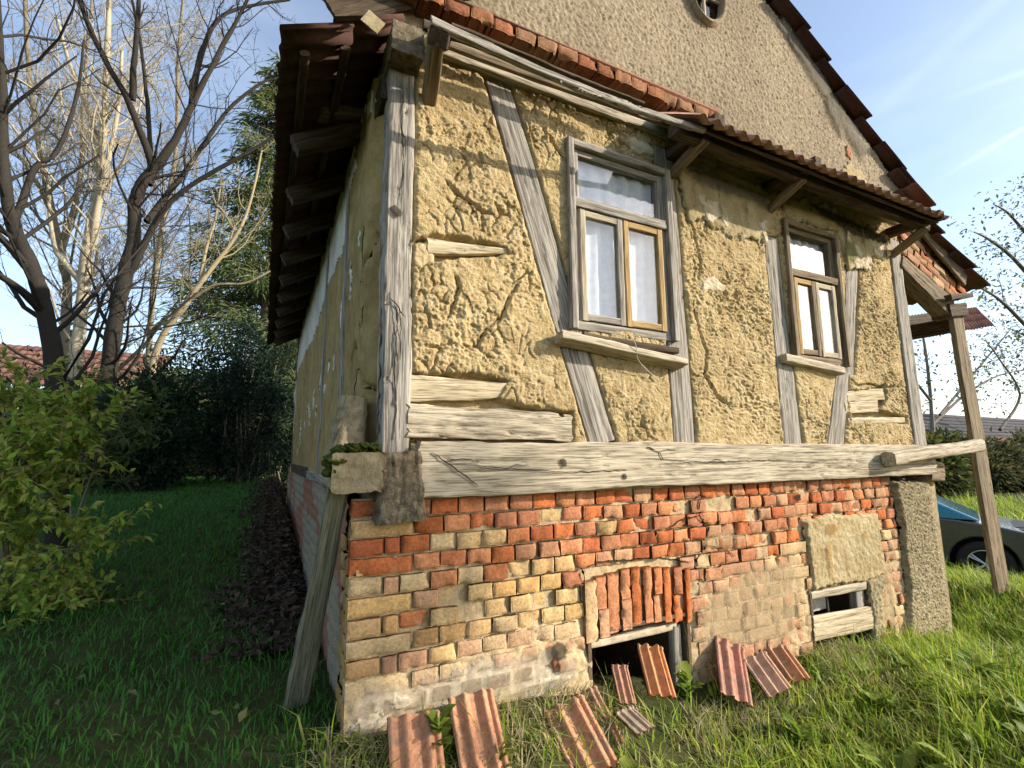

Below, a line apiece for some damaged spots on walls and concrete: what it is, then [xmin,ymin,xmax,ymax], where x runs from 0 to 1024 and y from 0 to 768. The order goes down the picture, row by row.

crack [446,180,495,226]
peeling [293,146,357,451]
crack [445,277,520,351]
crack [692,236,736,407]
crack [432,452,622,487]